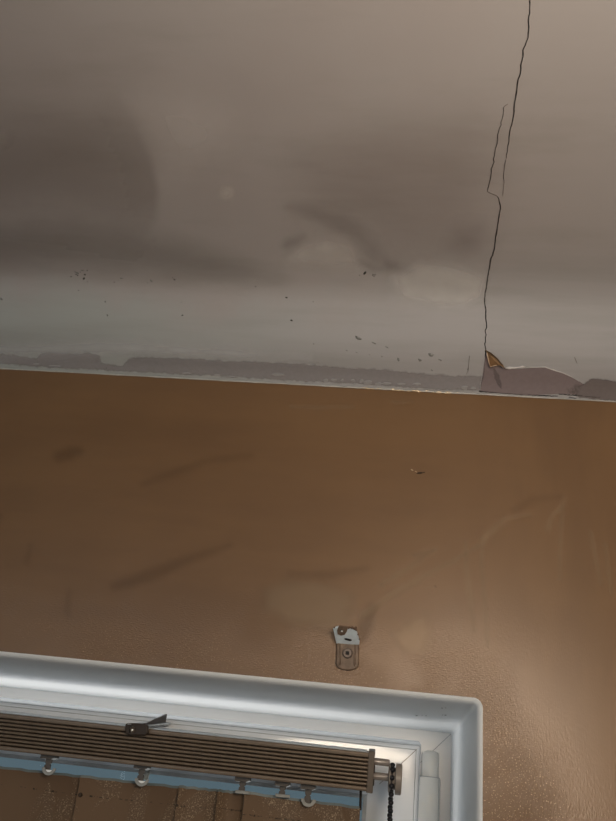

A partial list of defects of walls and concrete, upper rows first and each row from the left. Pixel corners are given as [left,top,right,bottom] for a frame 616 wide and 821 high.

peeling [0,352,616,401]
crack [467,0,530,386]